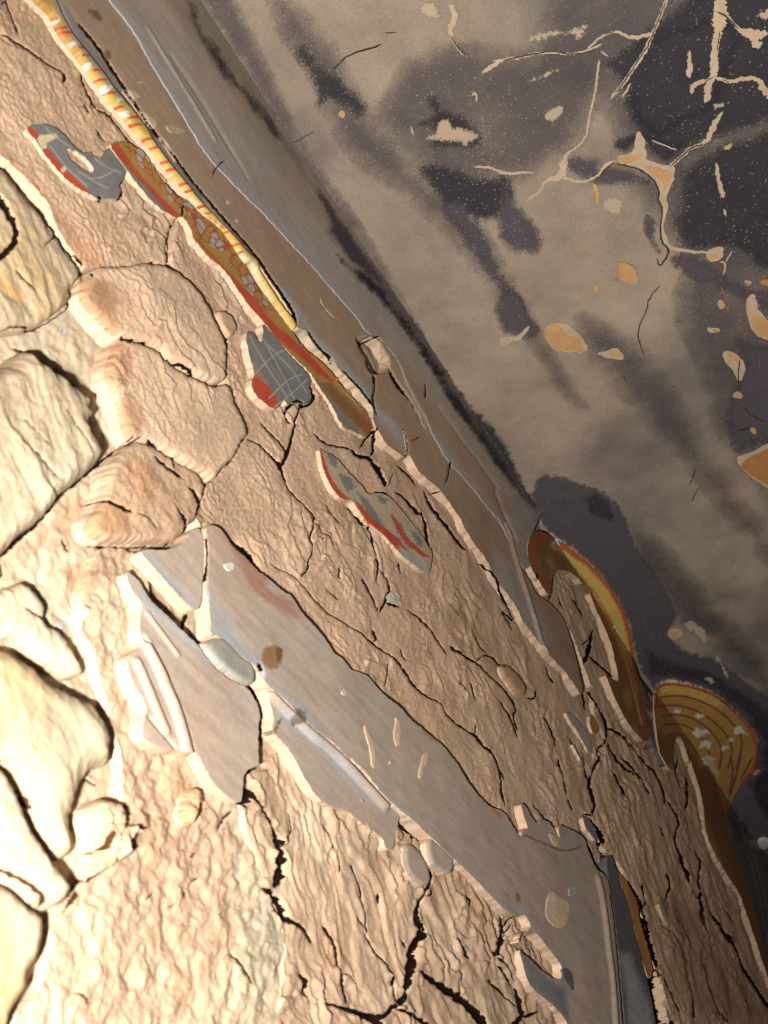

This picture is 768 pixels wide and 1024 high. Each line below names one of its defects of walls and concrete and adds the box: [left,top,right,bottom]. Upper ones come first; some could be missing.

spalling [0,0,273,335]
peeling [109,0,512,547]
crack [447,0,768,356]
spalling [617,132,675,250]
crack [738,359,764,445]
crack [146,853,199,909]
spalling [6,547,574,1024]
crack [217,766,487,1024]
spalling [166,220,768,1024]
crack [457,913,539,1024]
crack [535,572,614,677]
crack [544,691,768,1024]